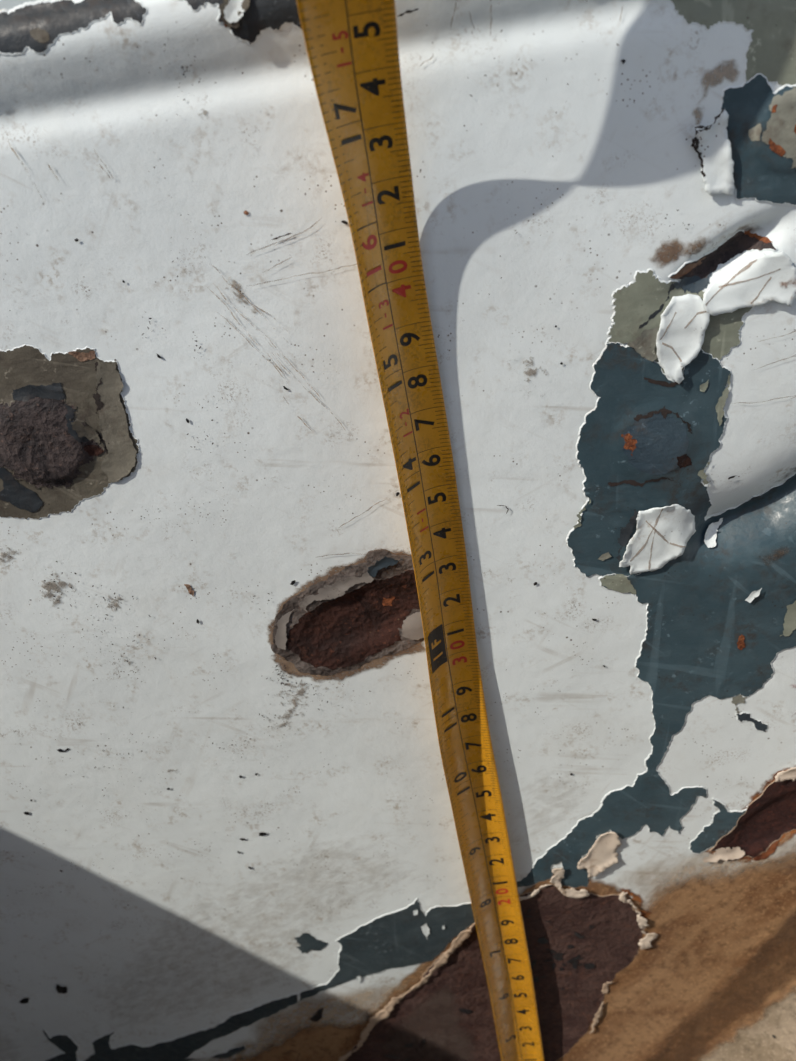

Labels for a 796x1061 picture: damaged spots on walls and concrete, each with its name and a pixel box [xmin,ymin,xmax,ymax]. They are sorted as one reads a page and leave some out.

peeling [0,0,148,57]
peeling [177,0,302,47]
peeling [668,0,796,207]
rust [653,241,706,279]
rust [741,227,772,243]
peeling [0,344,140,520]
rust [268,554,425,681]
peeling [516,268,796,888]
peeling [43,898,475,1061]
rust [219,923,473,1061]
rust [522,830,796,1061]